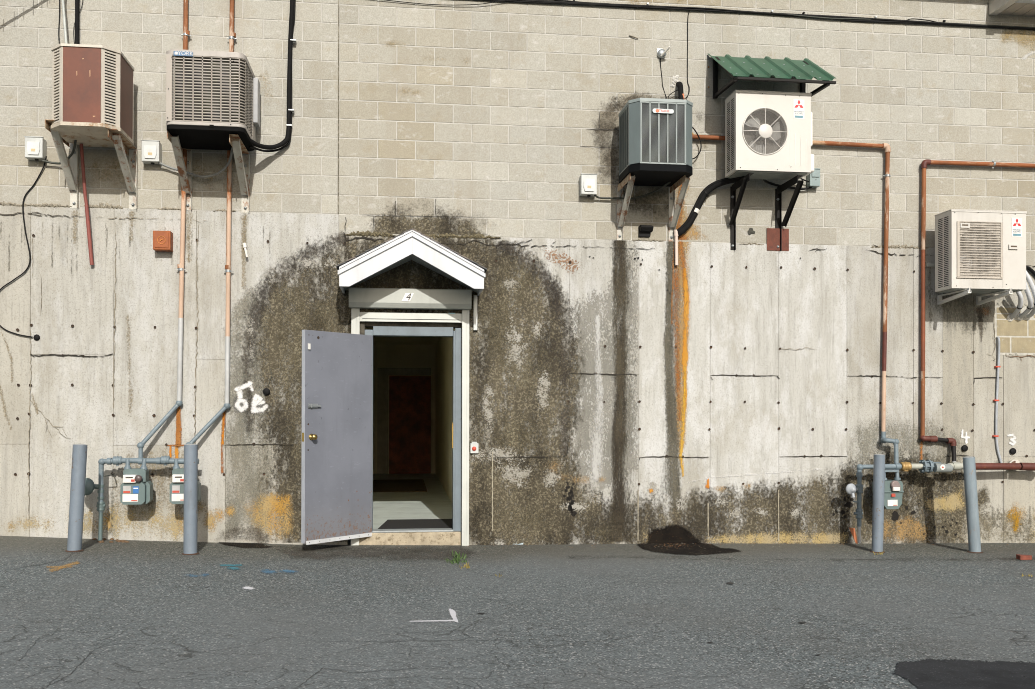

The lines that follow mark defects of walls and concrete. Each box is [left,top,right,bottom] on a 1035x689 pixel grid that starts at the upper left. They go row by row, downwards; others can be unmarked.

damp [83,452,184,539]
damp [198,208,1035,561]
rust [671,184,698,477]